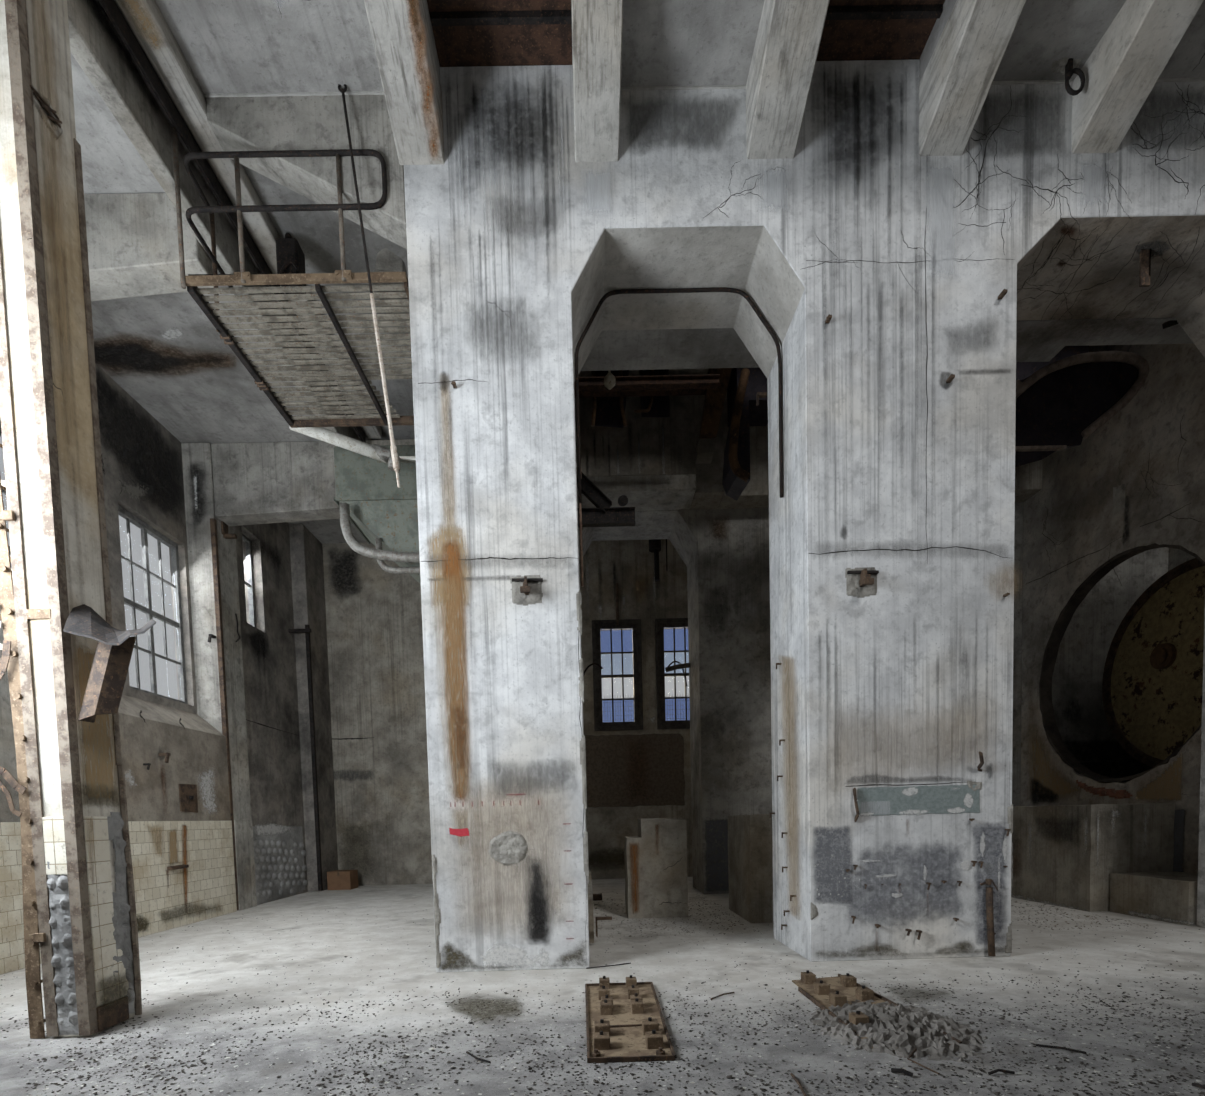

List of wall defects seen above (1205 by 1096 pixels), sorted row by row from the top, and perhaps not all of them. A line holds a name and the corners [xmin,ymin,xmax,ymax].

rust [408,0,437,156]
crack [802,53,1205,558]
rust [431,480,469,799]